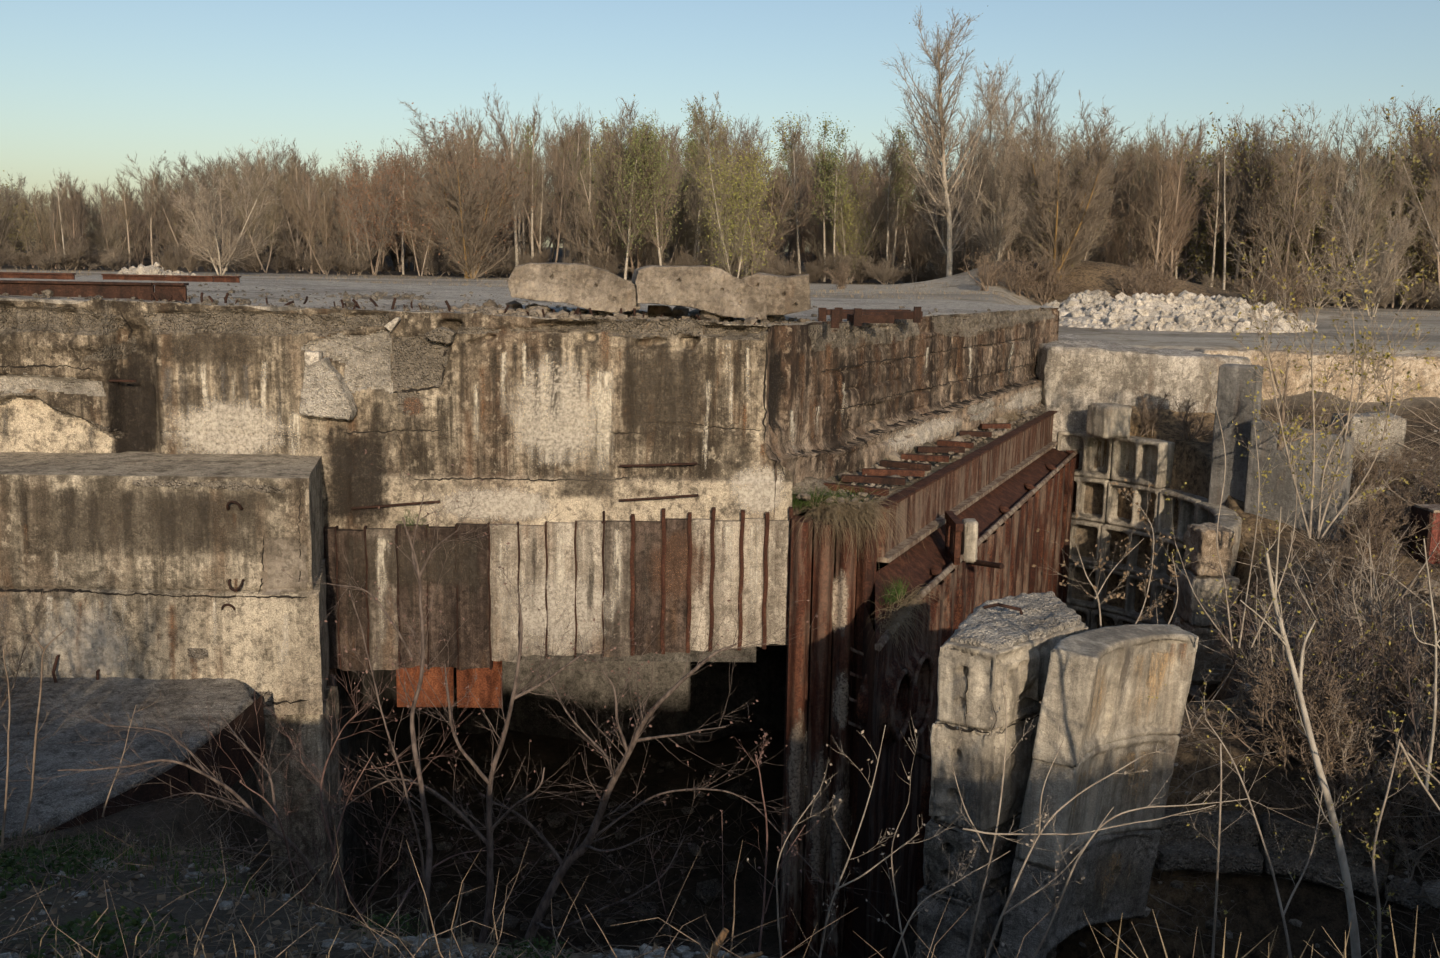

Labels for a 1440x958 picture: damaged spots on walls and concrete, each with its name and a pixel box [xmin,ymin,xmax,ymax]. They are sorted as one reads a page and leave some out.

crack [0,363,97,371]
spalling [0,304,127,337]
spalling [0,373,136,439]
spalling [144,292,764,415]
leakage [475,344,613,497]
leakage [328,404,388,521]
leakage [19,488,270,563]
leakage [348,539,481,618]
leakage [444,489,549,520]
corrosion [652,534,704,595]
leakage [39,597,127,678]
corrosion [41,696,266,835]